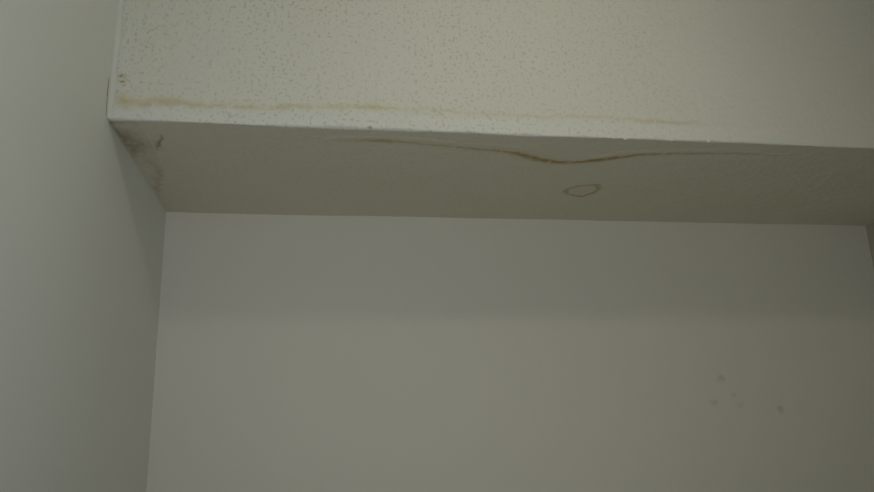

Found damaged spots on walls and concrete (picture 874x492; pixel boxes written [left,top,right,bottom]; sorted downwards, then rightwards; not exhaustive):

leakage [109,73,709,198]
leakage [325,135,802,166]